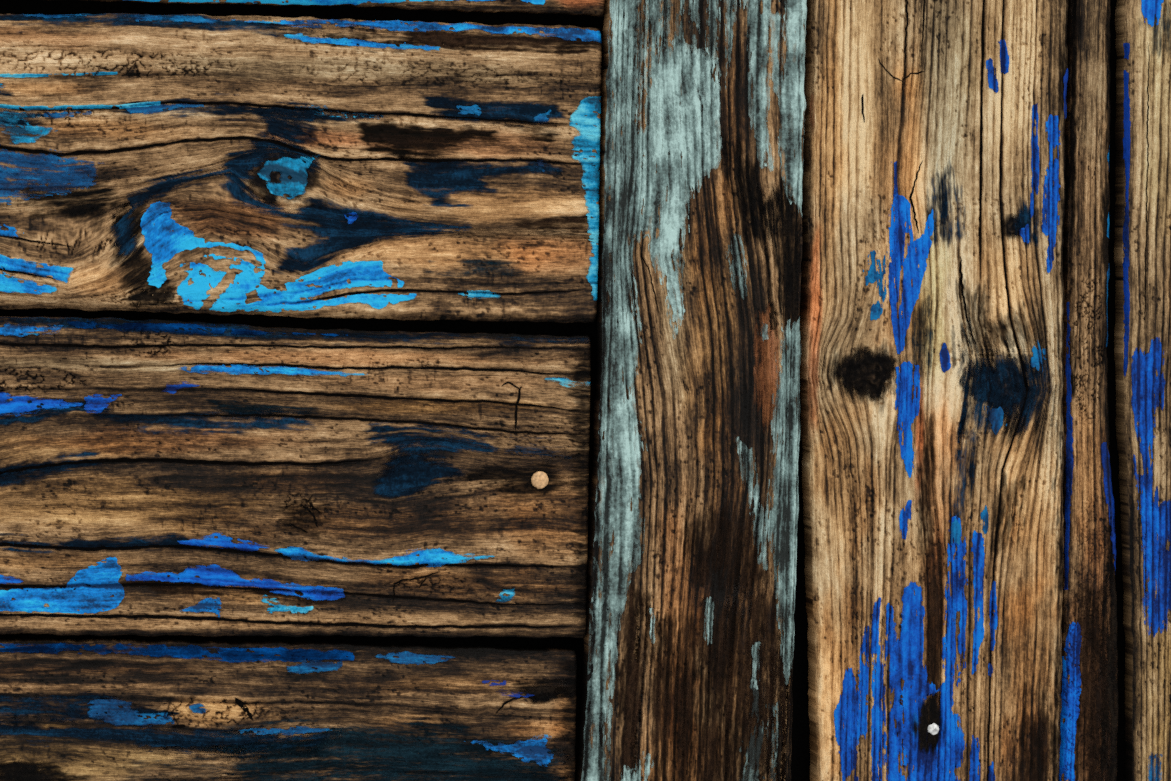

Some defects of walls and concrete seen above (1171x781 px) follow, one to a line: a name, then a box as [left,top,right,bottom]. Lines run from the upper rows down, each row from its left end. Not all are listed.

peeling [1141,0,1164,27]
peeling [0,101,204,205]
peeling [1019,68,1068,273]
peeling [0,254,73,294]
peeling [0,392,122,416]
peeling [0,321,268,337]
peeling [130,0,807,781]
peeling [863,161,934,478]
peeling [1107,43,1171,637]
peeling [0,557,344,618]
peeling [834,500,998,781]
peeling [1059,621,1082,781]